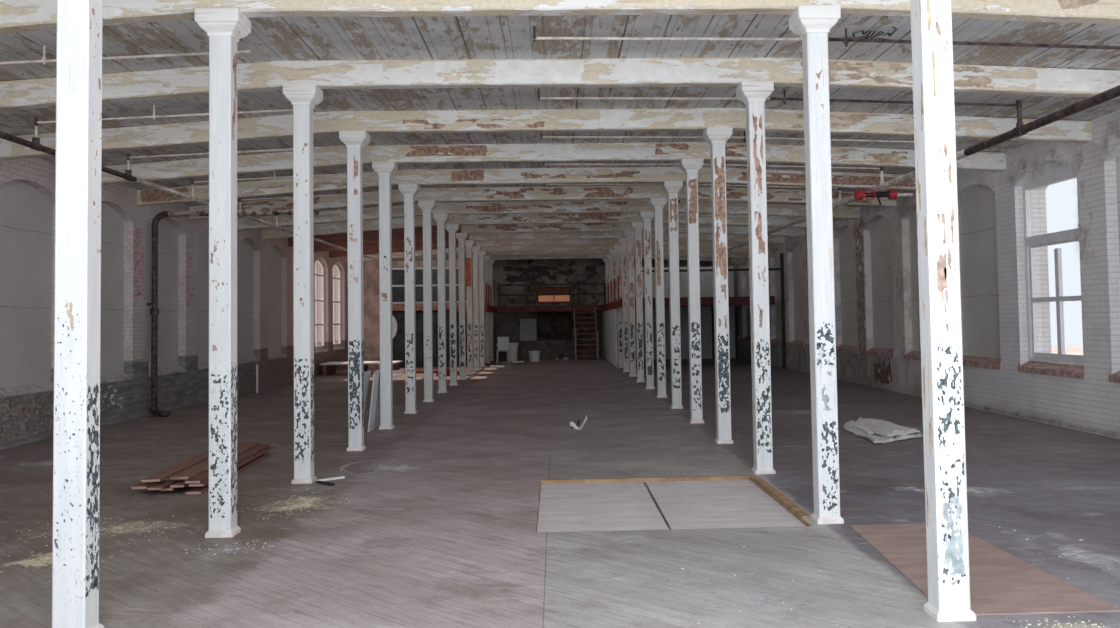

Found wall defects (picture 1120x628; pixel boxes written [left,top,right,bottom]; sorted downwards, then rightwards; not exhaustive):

peeling [1058,0,1100,9]
peeling [405,145,488,156]
peeling [403,119,512,129]
peeling [466,144,640,231]
peeling [600,109,705,127]
peeling [655,143,689,155]
peeling [0,384,123,598]
peeling [210,362,237,519]
peeling [295,358,314,463]
peeling [349,340,364,429]
peeling [817,230,892,511]
peeling [923,344,967,587]